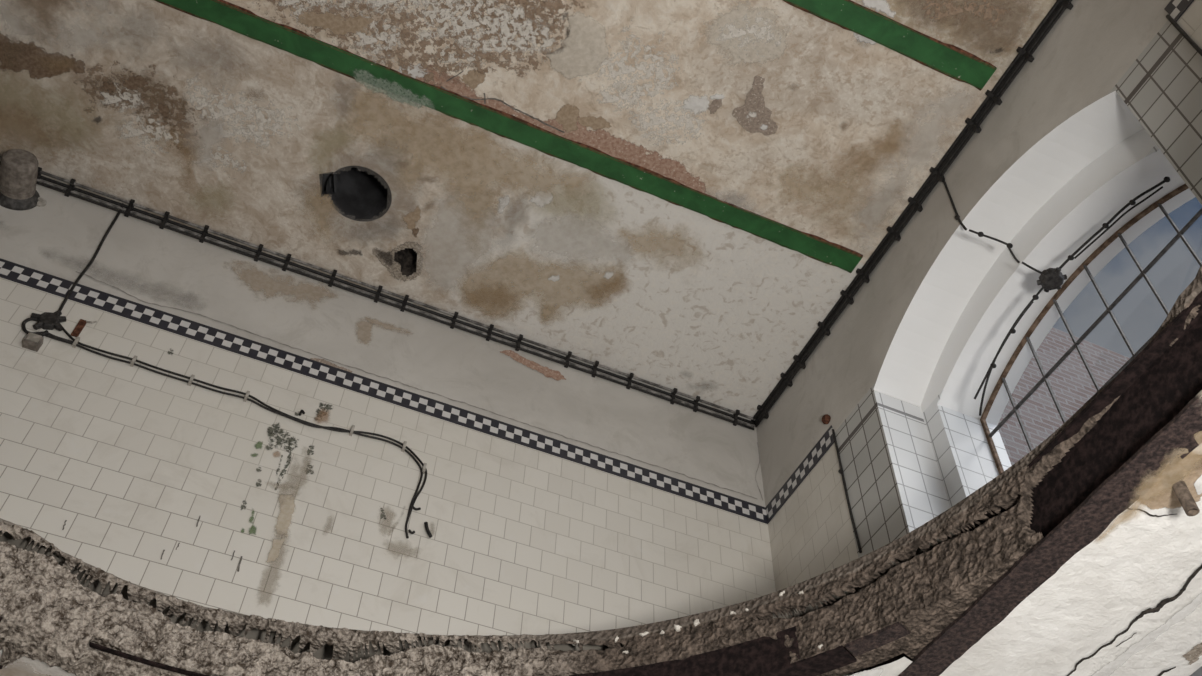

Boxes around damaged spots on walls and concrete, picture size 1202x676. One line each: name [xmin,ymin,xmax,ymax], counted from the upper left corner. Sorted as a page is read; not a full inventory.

peeling [862,0,896,18]
peeling [248,0,707,193]
peeling [682,76,778,135]
peeling [357,318,410,343]
spalling [1146,266,1202,346]
peeling [500,350,566,381]
damp [251,423,314,563]
spalling [0,381,1121,676]
crack [1123,507,1176,517]
spalling [1137,452,1202,510]
crack [1067,565,1202,676]
spalling [1183,643,1202,665]